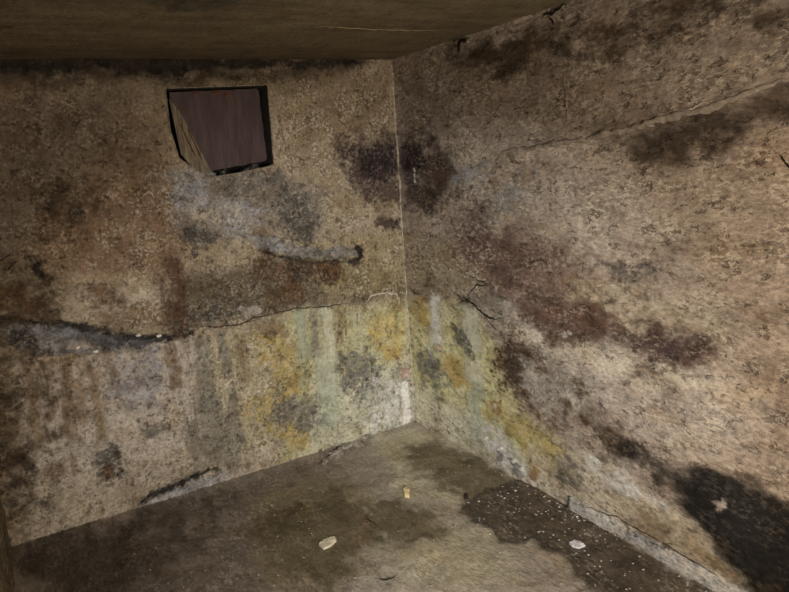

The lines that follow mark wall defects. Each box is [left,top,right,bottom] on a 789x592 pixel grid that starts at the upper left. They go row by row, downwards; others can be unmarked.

damp [453,160,728,366]
damp [169,243,667,508]
damp [25,509,186,592]
damp [258,488,446,583]
damp [407,442,708,592]
damp [621,445,789,592]